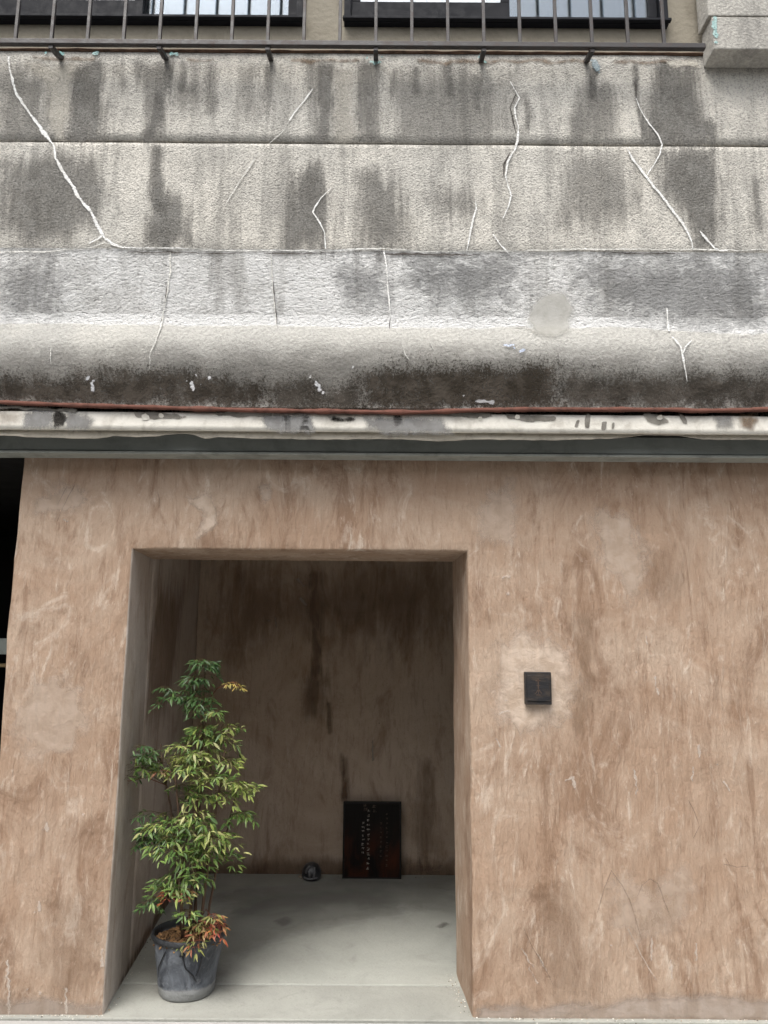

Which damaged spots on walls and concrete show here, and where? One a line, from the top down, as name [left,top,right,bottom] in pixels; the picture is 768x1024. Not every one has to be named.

water stain [3,59,104,142]
water stain [310,63,333,143]
water stain [358,63,379,142]
water stain [0,154,101,242]
water stain [136,63,192,251]
water stain [285,163,327,254]
water stain [361,171,403,253]
crack [0,56,767,379]
water stain [634,62,724,245]
water stain [413,256,513,295]
water stain [0,354,768,416]